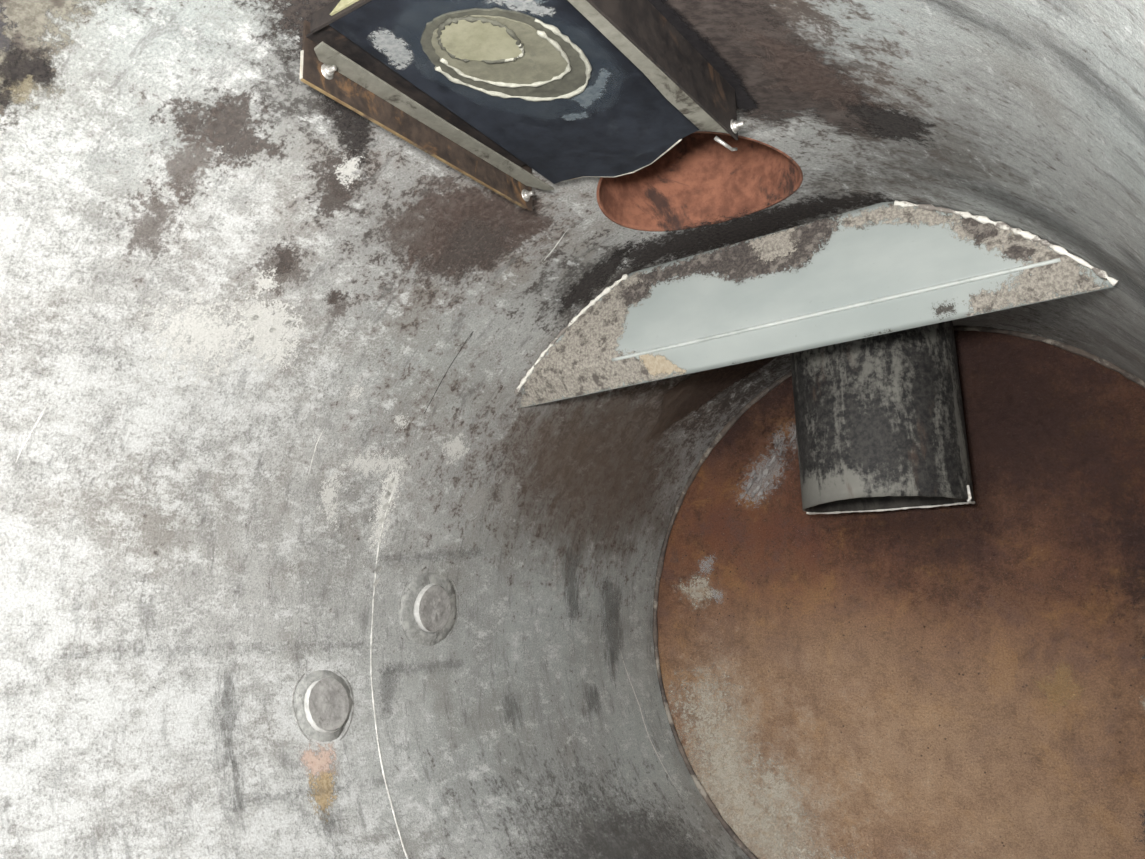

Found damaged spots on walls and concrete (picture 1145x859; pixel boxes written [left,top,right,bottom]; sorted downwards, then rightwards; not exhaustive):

peeling [617,280,653,307]
peeling [640,354,686,377]
rust [657,355,782,434]
rust [301,743,337,825]